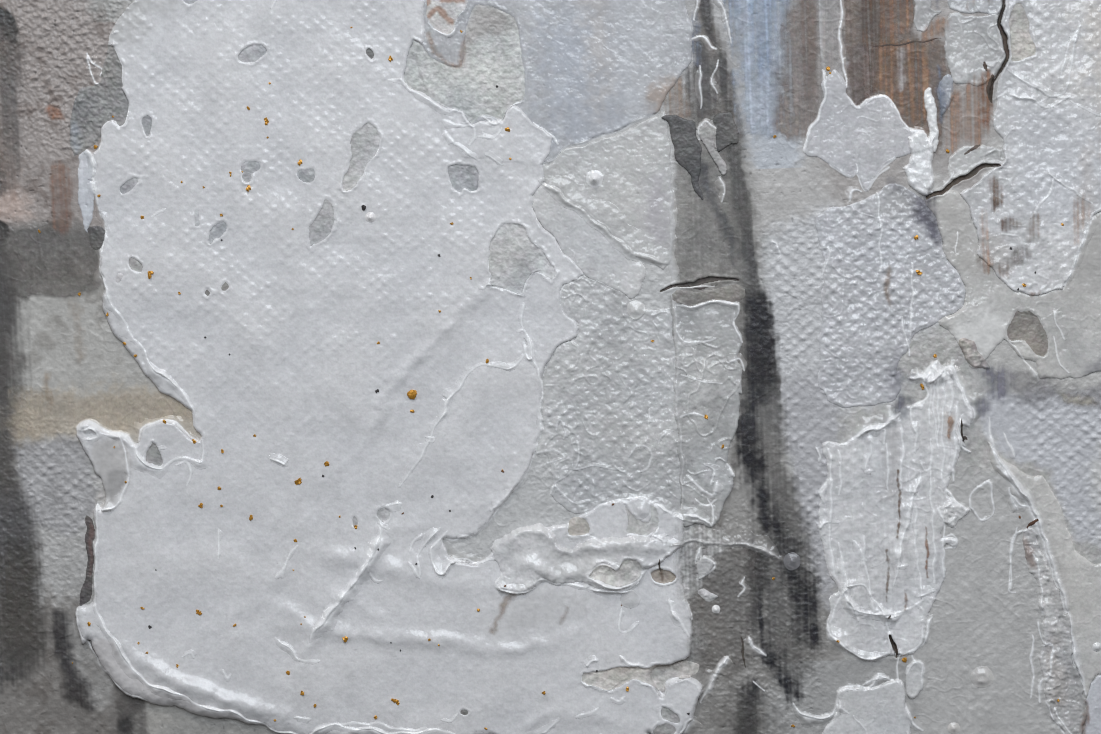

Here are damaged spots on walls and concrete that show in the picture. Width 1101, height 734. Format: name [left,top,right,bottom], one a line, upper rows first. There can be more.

peeling [70,44,130,156]
peeling [387,0,525,192]
rust [842,0,991,151]
crack [983,0,1009,103]
spalling [342,123,380,190]
crack [926,144,1001,199]
spalling [87,226,105,250]
spalling [478,223,555,297]
crack [660,277,739,292]
spalling [1007,311,1048,357]
peeling [80,515,95,606]
peeling [582,655,699,692]